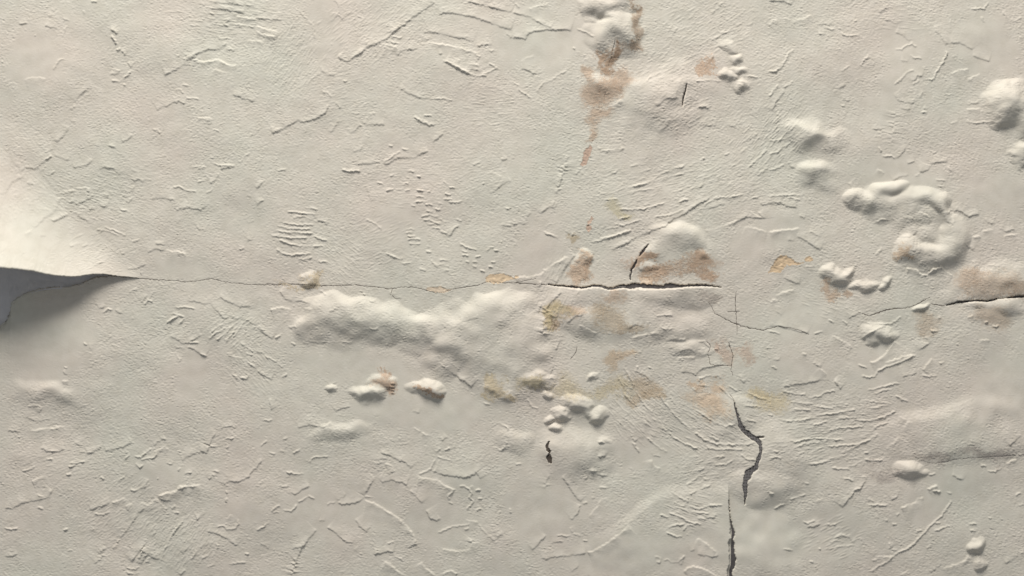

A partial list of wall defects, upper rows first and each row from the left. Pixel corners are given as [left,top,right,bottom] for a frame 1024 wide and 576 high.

flaking render [0,143,141,325]
crack [859,295,1024,316]
crack [140,245,807,576]